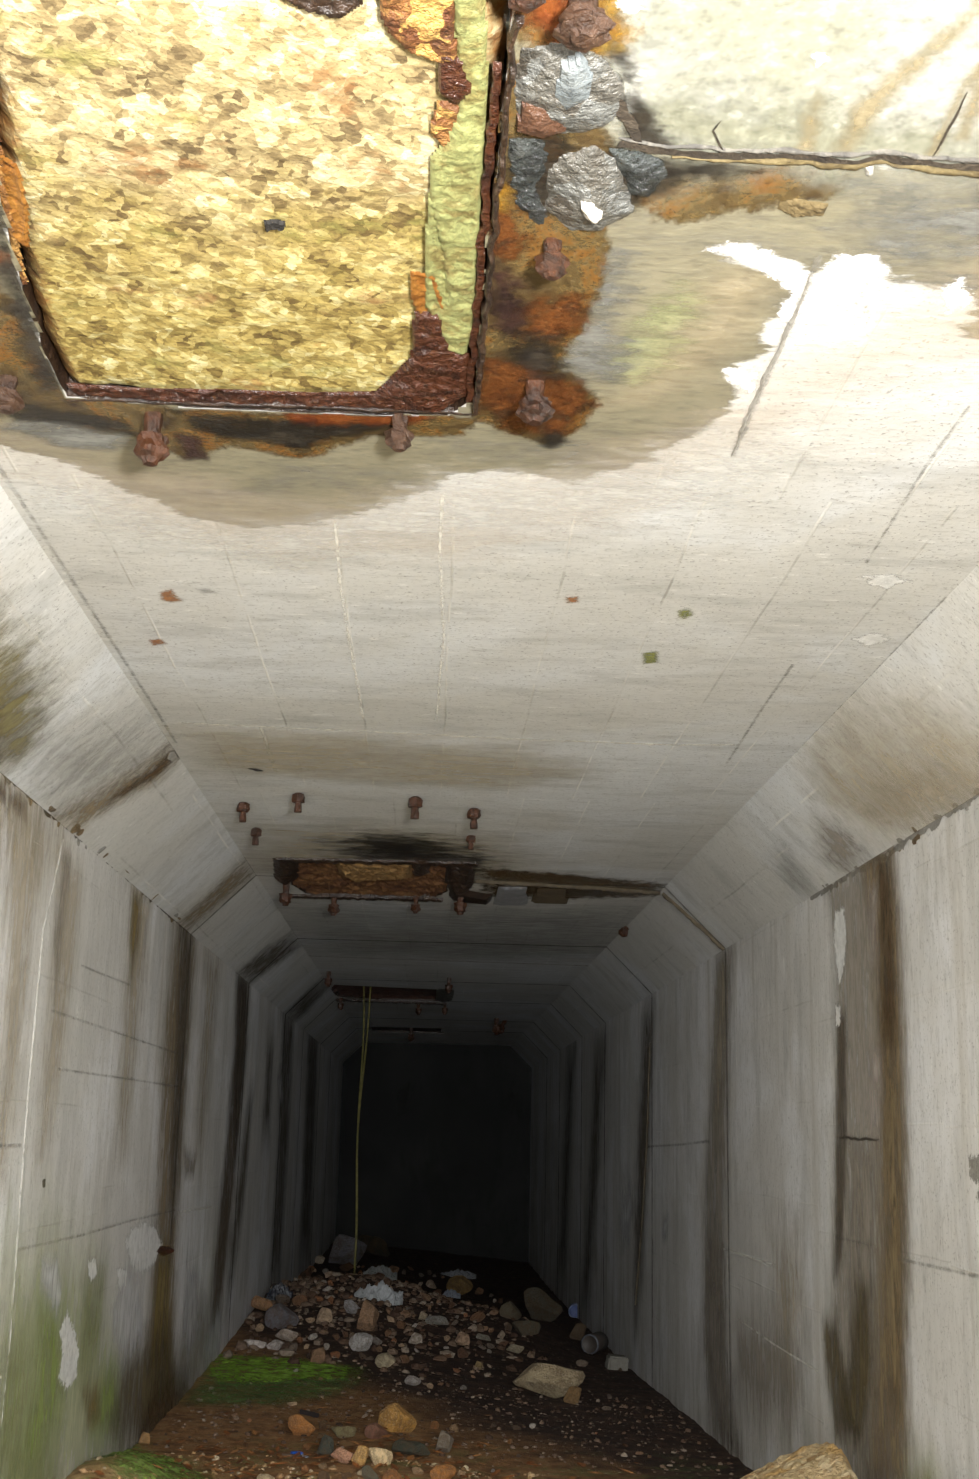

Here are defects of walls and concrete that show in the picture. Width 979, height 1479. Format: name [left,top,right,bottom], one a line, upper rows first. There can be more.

leakage [0,0,979,528]
rust [472,0,749,448]
crack [731,271,813,457]
leakage [0,783,33,1059]
leakage [0,628,44,762]
leakage [113,862,320,1445]
leakage [316,832,797,1456]
leakage [821,822,907,1479]